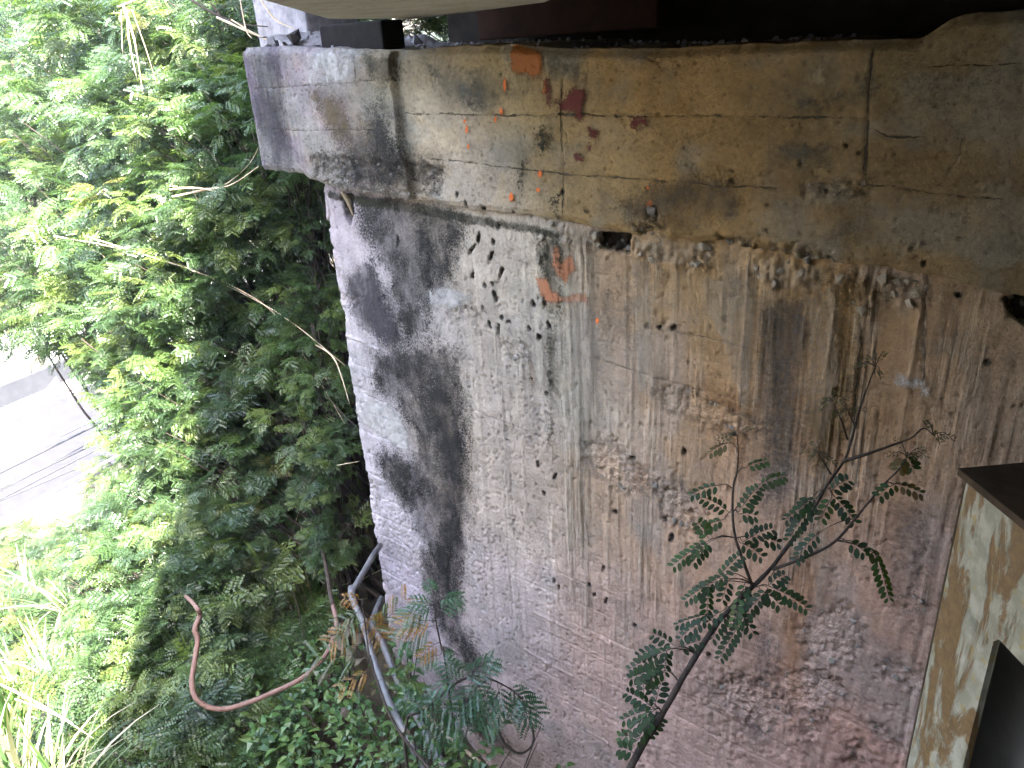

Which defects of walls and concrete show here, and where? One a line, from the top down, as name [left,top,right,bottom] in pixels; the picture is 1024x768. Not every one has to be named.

crack [560,82,568,215]
crack [849,48,926,190]
spalling [600,206,667,253]
spalling [726,237,835,264]
damp [320,50,563,760]